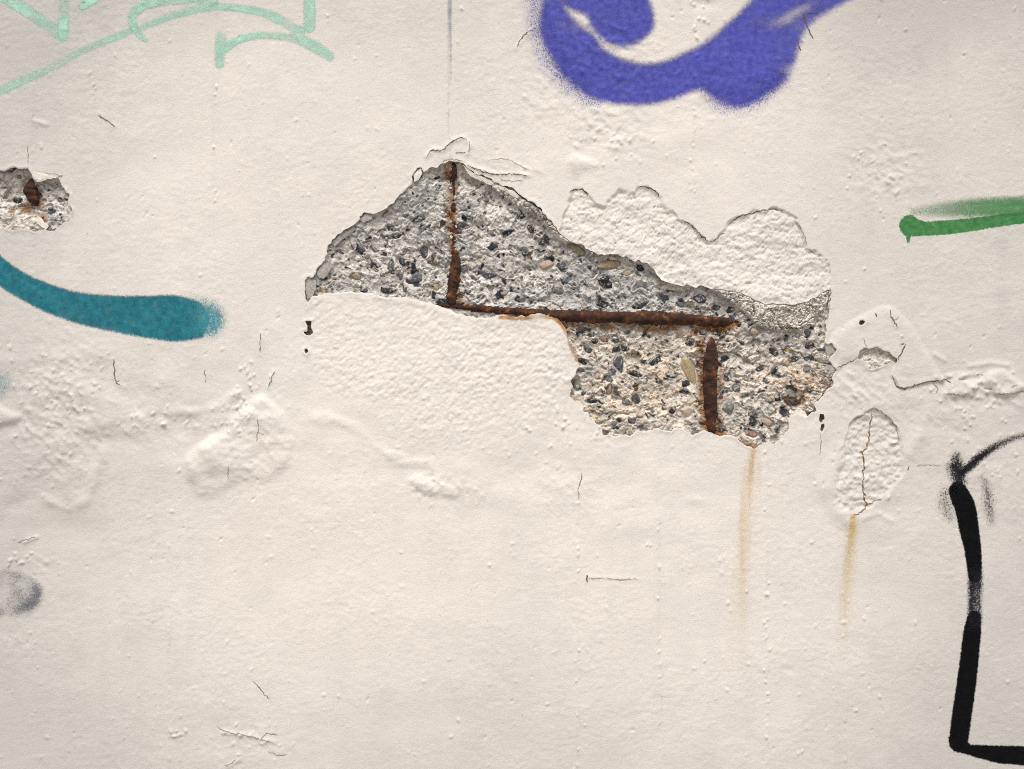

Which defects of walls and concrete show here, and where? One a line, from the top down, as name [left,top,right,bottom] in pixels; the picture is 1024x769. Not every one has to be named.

spalling [0,167,72,232]
spalling [305,161,836,449]
rust [693,322,739,352]
spalling [858,347,897,370]
crack [875,309,1024,397]
rust [699,373,724,436]
crack [853,408,899,517]